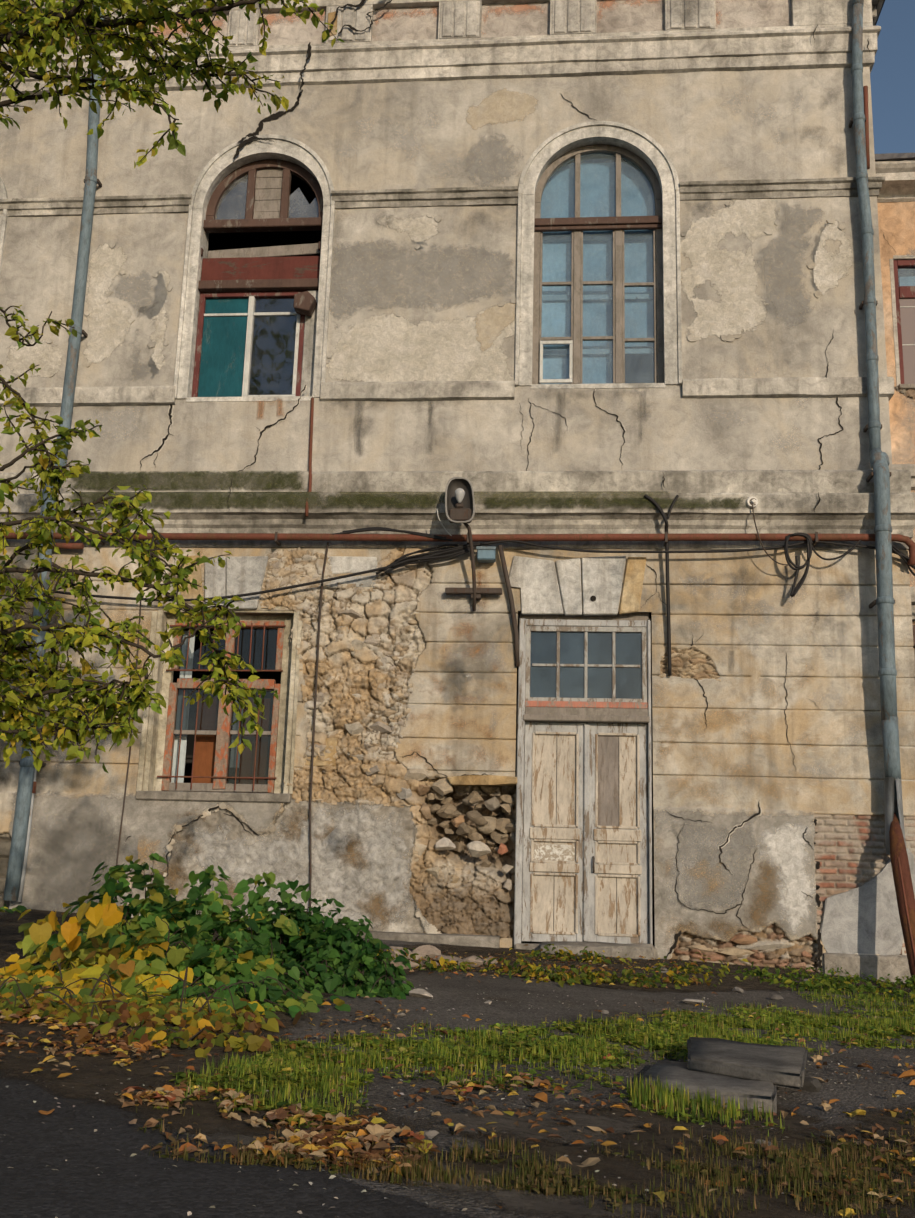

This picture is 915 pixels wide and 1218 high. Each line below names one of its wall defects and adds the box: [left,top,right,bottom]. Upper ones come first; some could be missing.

crack [233,0,392,162]
flaking render [83,242,135,367]
flaking render [680,199,780,342]
flaking render [806,217,853,298]
crack [140,405,174,470]
crack [227,385,307,513]
crack [593,388,626,468]
crack [814,329,843,513]
flaking render [658,635,721,681]
crack [665,802,762,959]
flaking render [671,810,906,972]
flaking render [904,816,915,897]